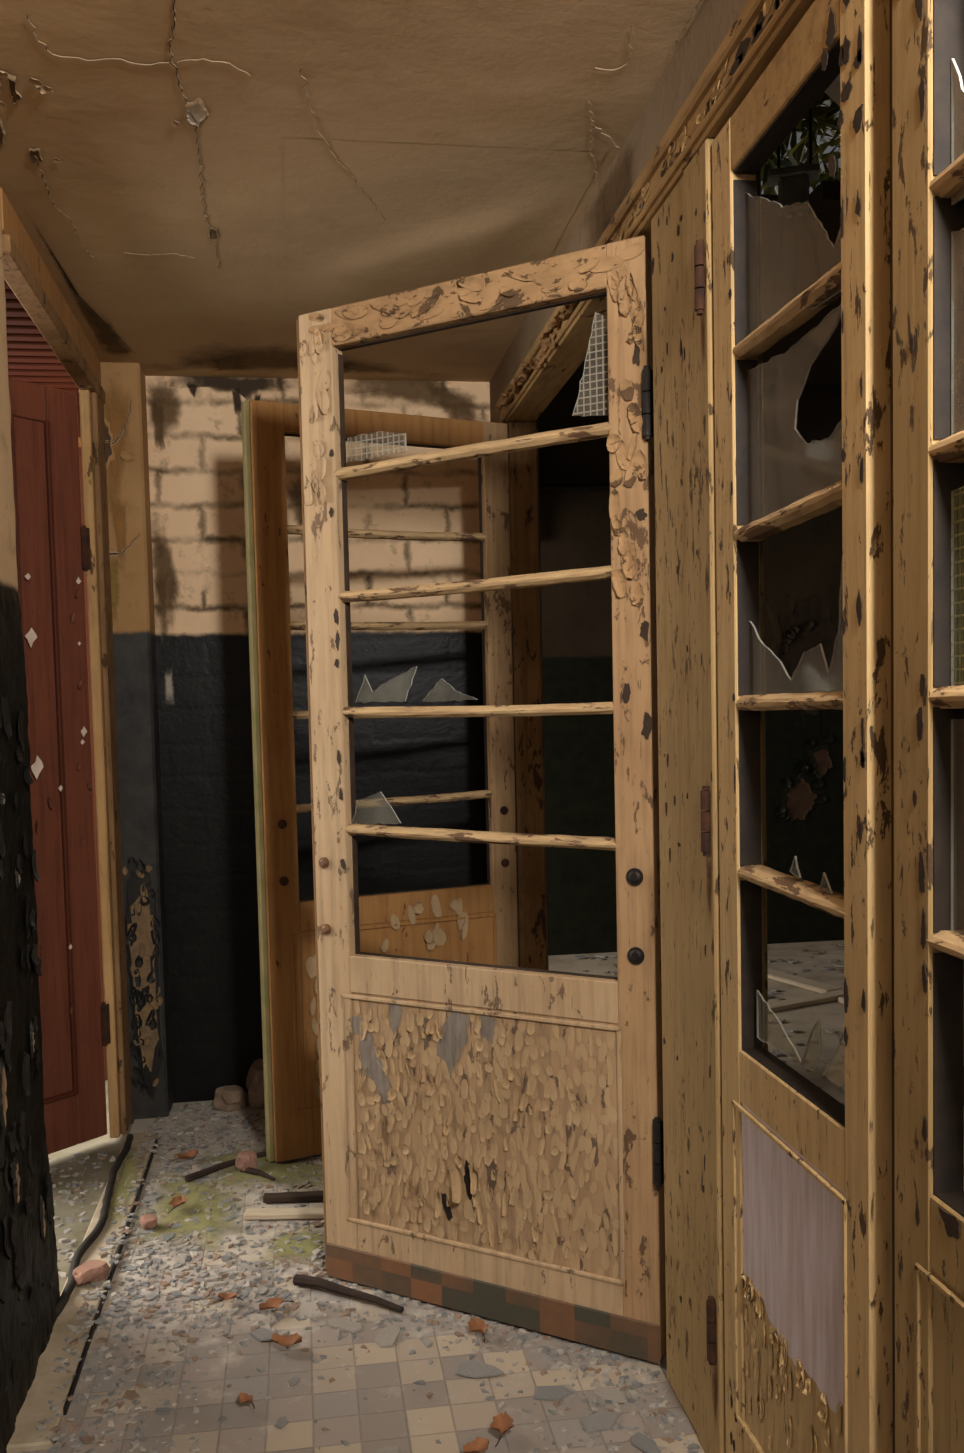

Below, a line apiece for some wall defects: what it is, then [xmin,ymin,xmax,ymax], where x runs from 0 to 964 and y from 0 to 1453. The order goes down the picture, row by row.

crack [27,0,251,268]
peeling [821,0,863,133]
peeling [918,78,926,122]
peeling [25,628,37,647]
peeling [916,674,926,741]
peeling [0,697,43,977]
peeling [123,857,164,1100]
peeling [918,851,927,993]
peeling [0,1001,55,1341]
peeling [352,998,620,1279]
peeling [730,1104,845,1453]
peeling [938,1206,960,1239]